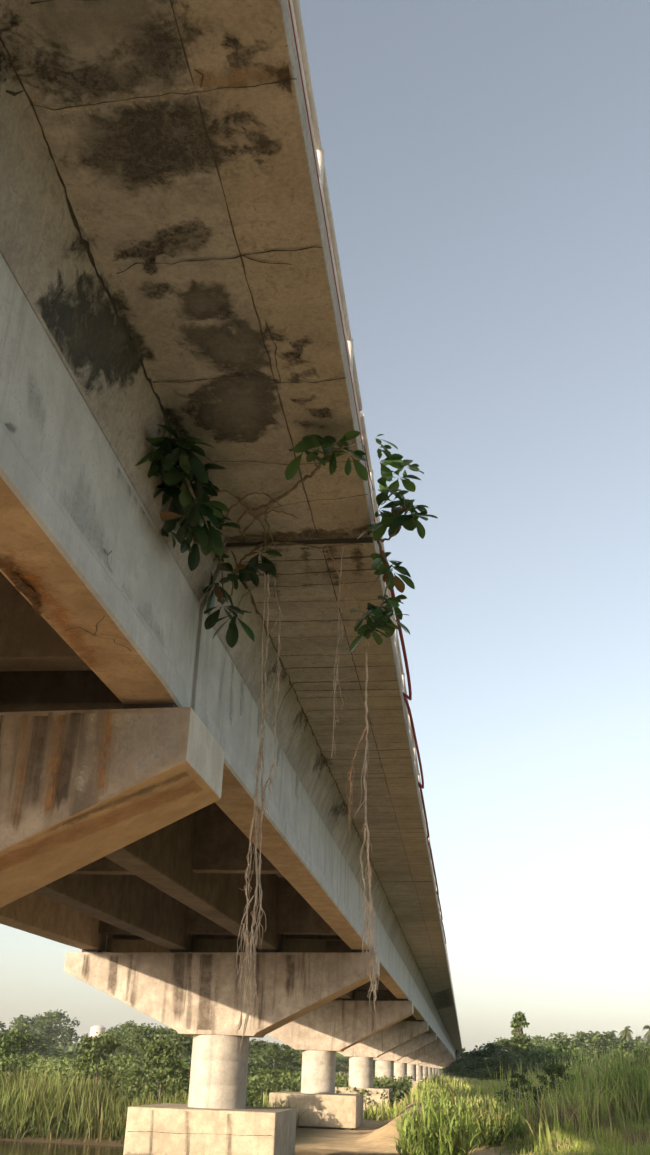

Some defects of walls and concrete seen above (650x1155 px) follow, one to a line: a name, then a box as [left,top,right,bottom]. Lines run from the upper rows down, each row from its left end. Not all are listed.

leakage [0,22,281,189]
leakage [38,271,154,395]
crack [0,36,346,427]
leakage [116,223,315,442]